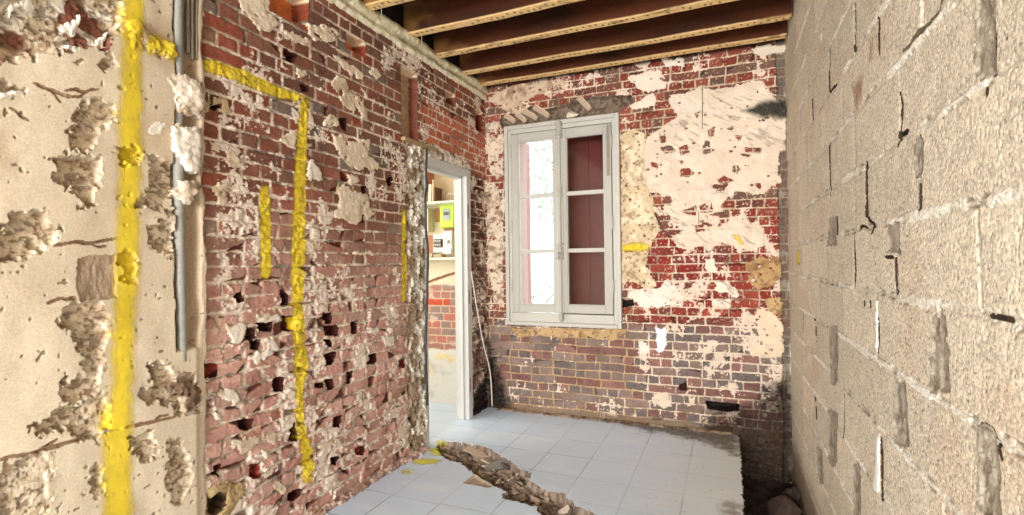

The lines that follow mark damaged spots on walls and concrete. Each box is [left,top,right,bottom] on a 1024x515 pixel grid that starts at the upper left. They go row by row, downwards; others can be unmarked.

crack [854,0,944,56]
flaking render [48,96,120,212]
flaking render [238,0,393,225]
flaking render [474,80,566,308]
flaking render [620,57,787,358]
crack [812,60,837,119]
crack [829,143,900,356]
crack [897,91,924,212]
flaking render [225,290,292,365]
spalling [314,312,396,390]
spalling [205,492,227,515]
flaking render [231,418,300,479]